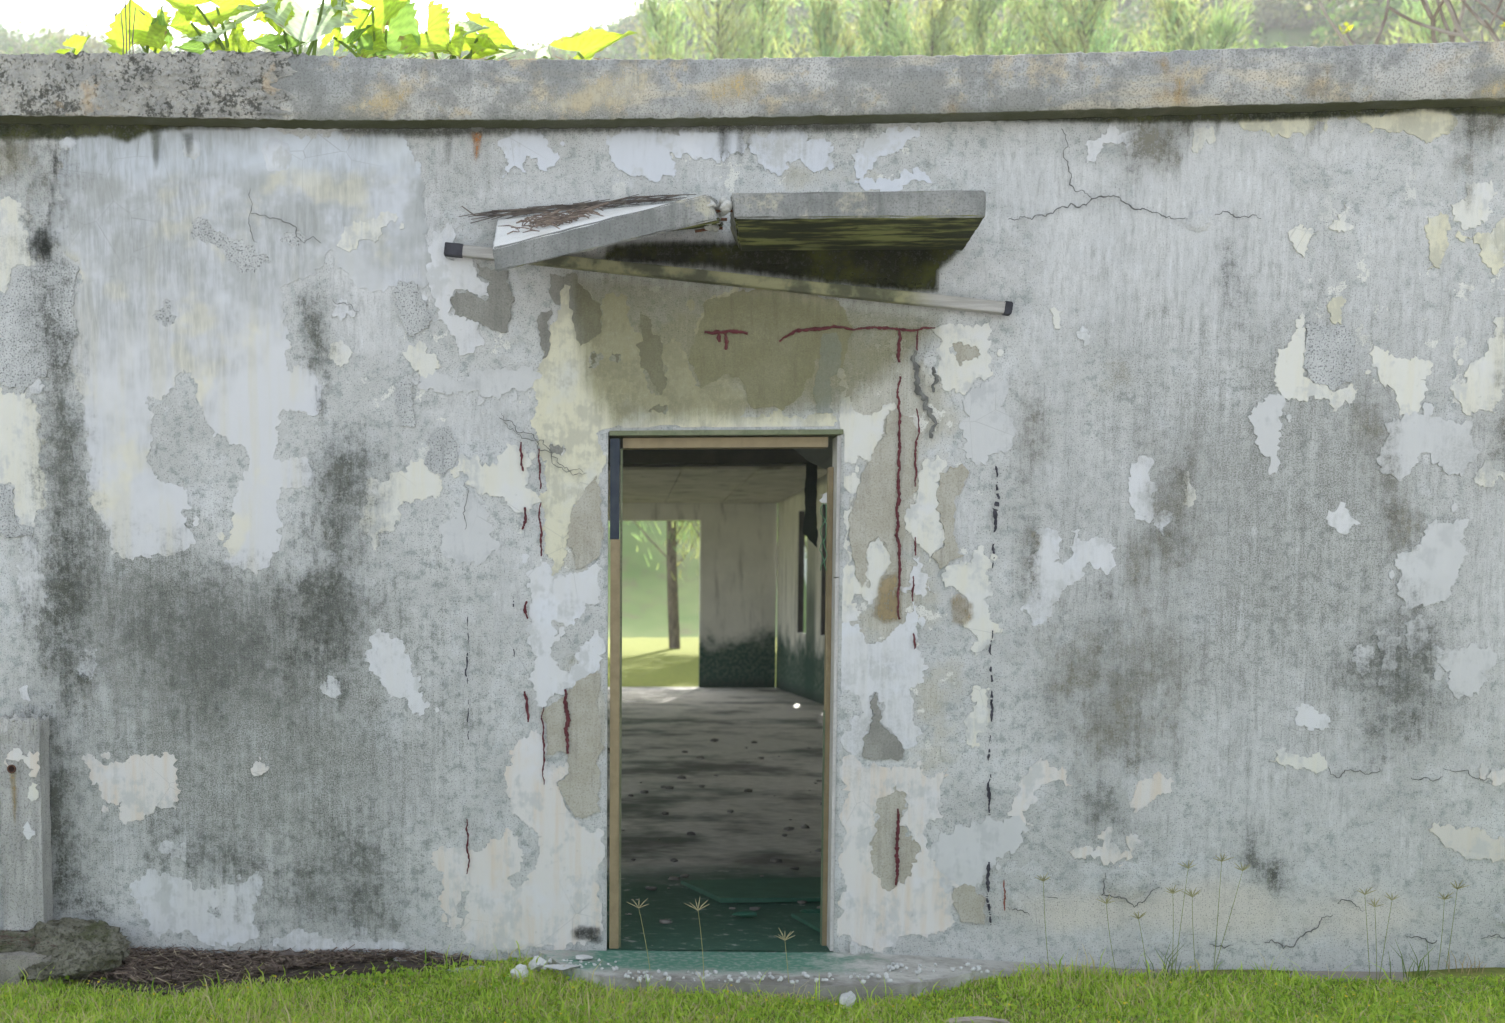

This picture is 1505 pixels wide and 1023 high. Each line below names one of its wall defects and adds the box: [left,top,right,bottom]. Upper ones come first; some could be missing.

leakage [29,221,52,261]
crack [1009,129,1261,220]
peeling [1288,202,1354,257]
peeling [1424,179,1505,275]
peeling [1248,296,1505,487]
leakage [39,286,92,700]
leakage [286,448,374,663]
peeling [0,49,1072,954]
rust [877,575,898,621]
leakage [1342,627,1436,728]
peeling [1352,502,1497,699]
leakage [50,738,102,921]